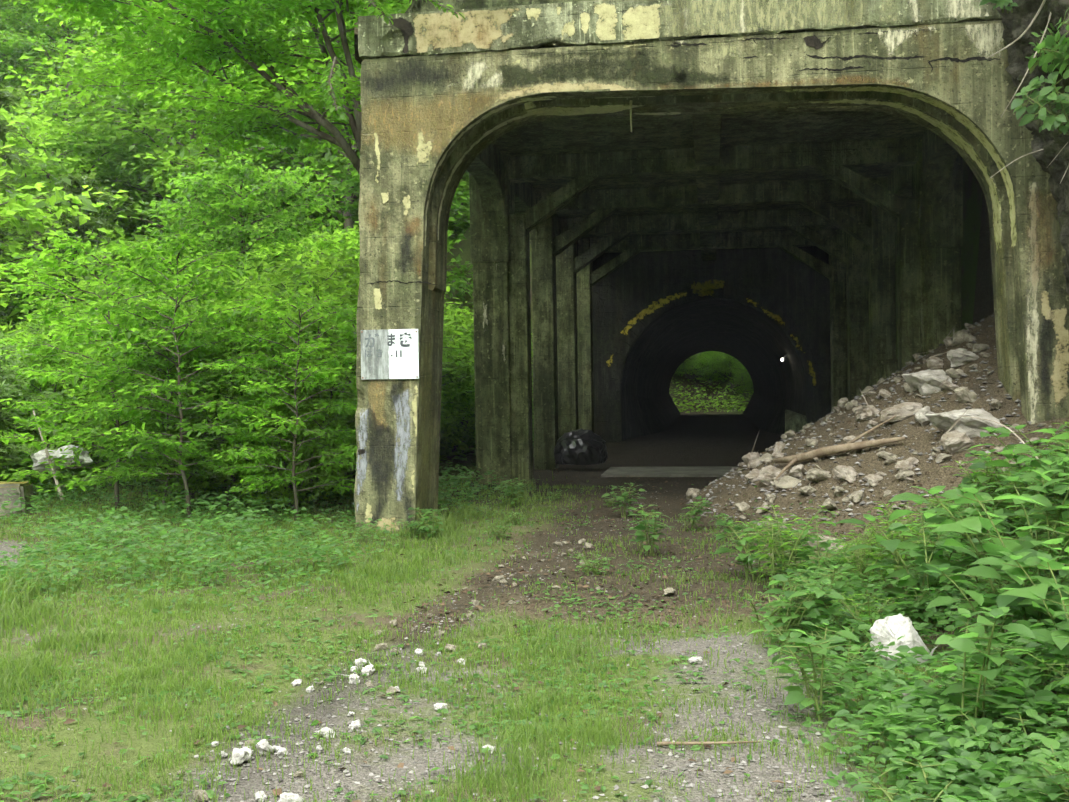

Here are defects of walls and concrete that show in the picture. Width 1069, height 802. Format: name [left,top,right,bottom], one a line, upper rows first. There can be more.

peeling [389,8,541,53]
peeling [553,0,863,60]
crack [735,18,1001,72]
peeling [772,86,1069,424]
damp [368,407,393,523]